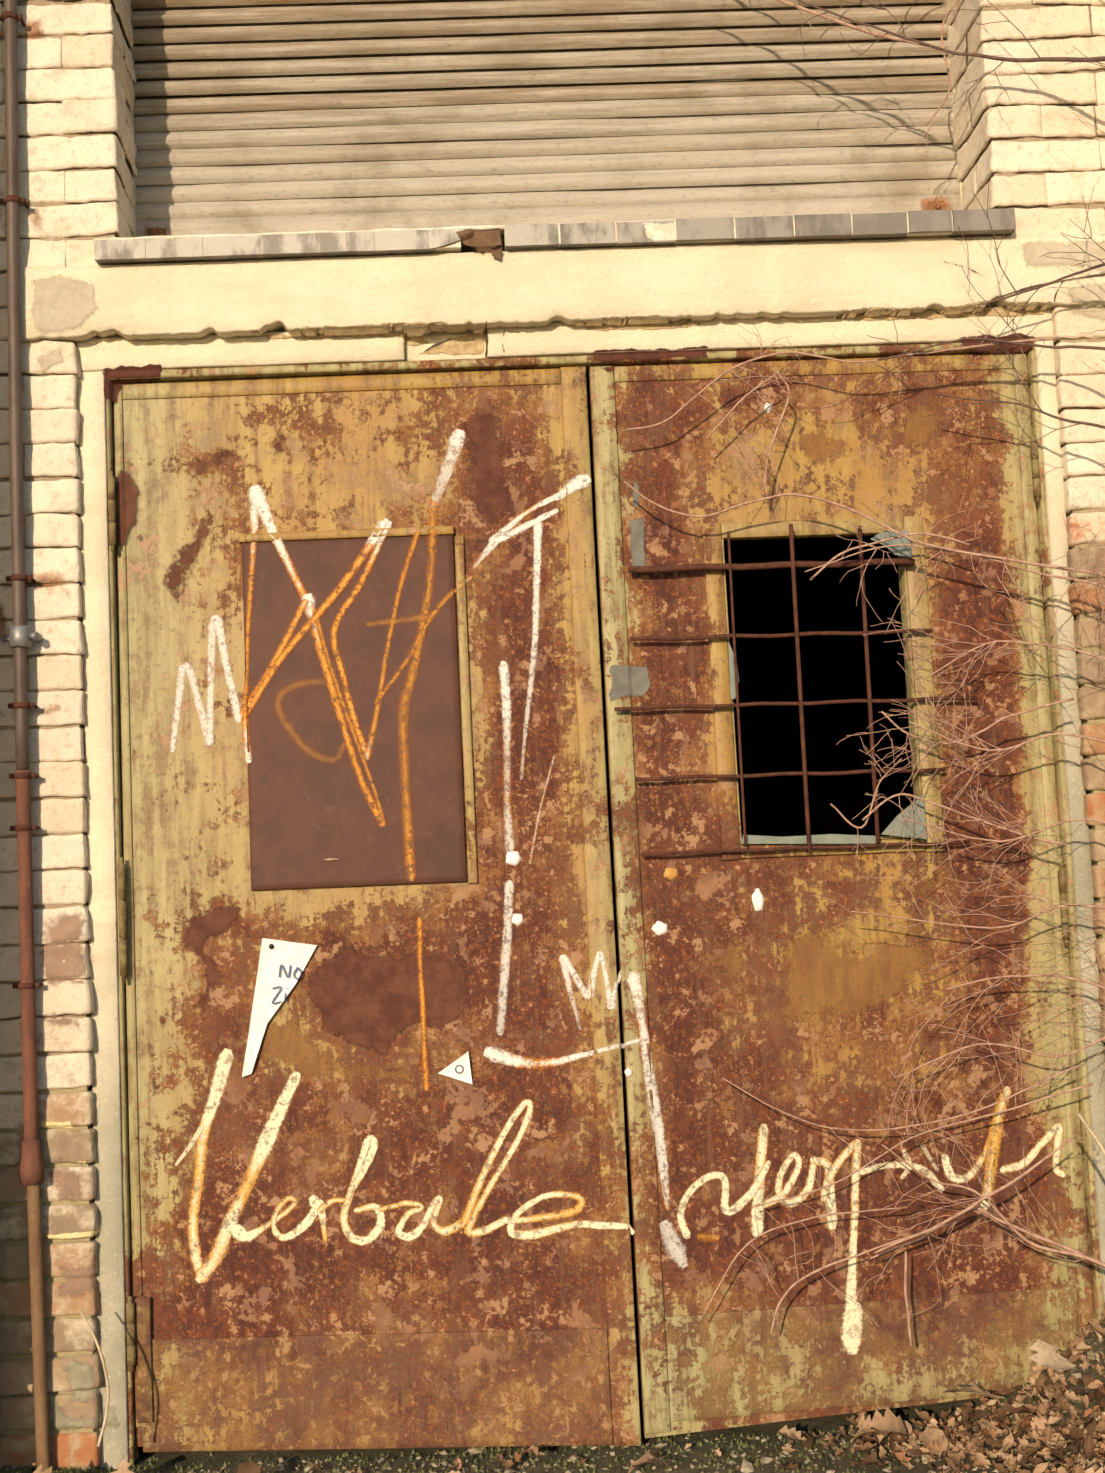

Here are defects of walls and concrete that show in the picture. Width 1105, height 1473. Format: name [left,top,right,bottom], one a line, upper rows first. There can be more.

rust [146,228,166,236]
rust [593,345,708,372]
rust [103,364,162,403]